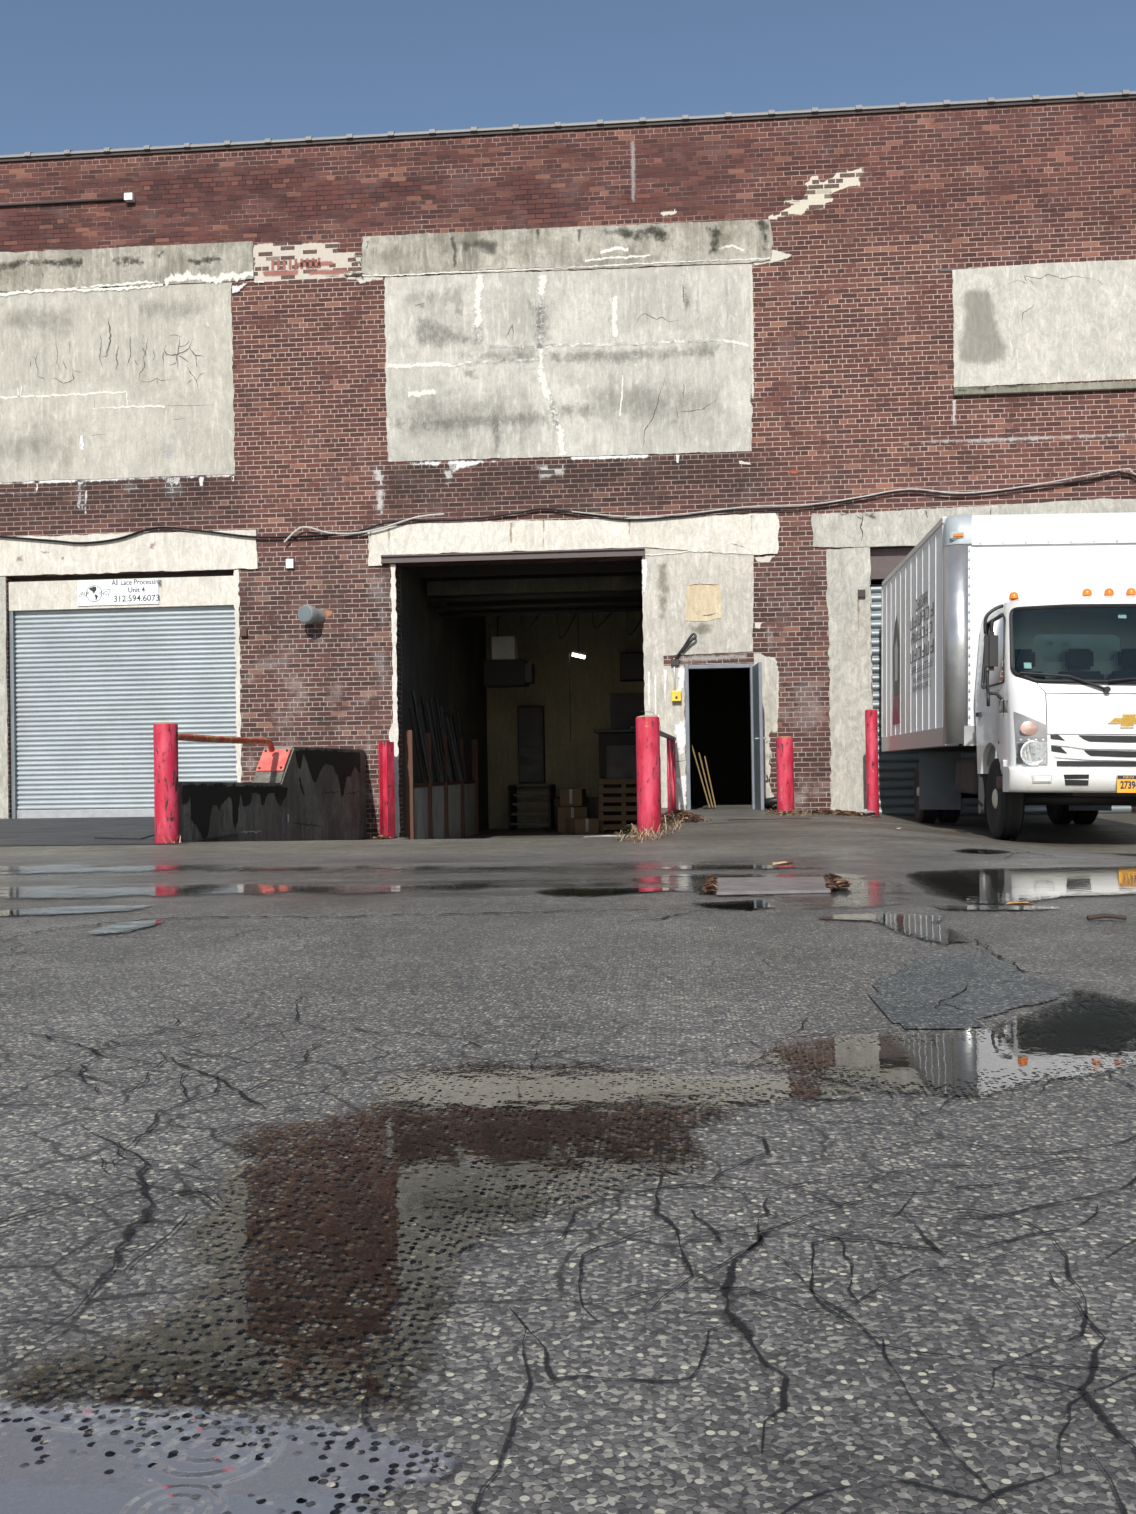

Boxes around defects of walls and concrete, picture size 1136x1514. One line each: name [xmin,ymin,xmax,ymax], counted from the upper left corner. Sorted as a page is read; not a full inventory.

peeling [768,167,863,219]
peeling [232,242,383,293]
water stain [182,748,360,841]